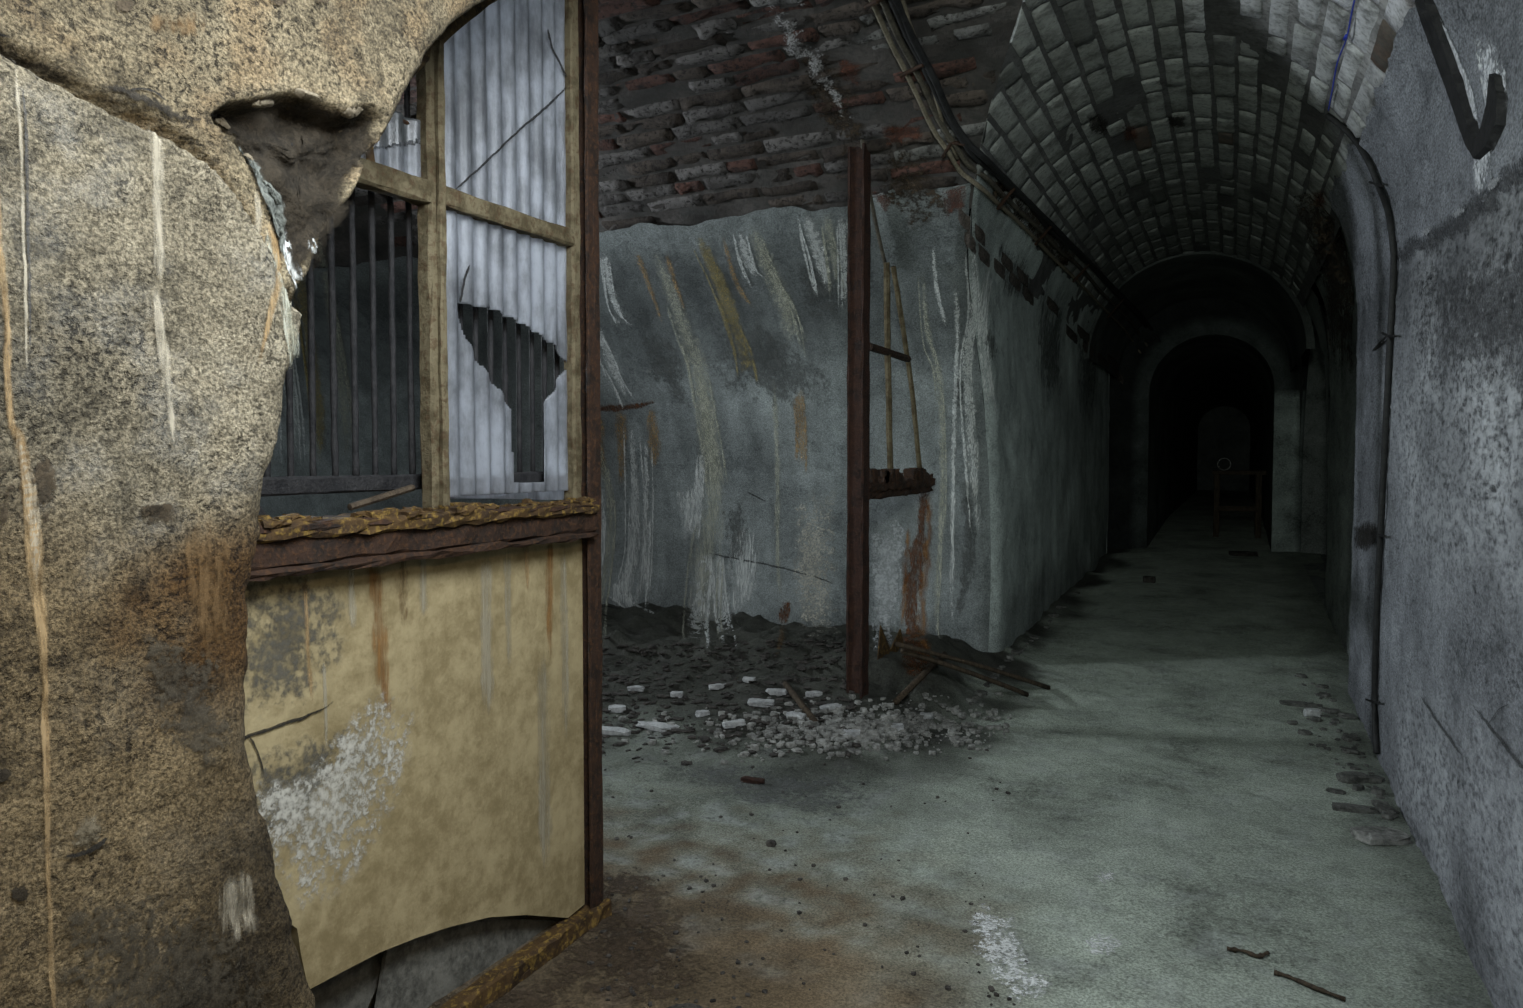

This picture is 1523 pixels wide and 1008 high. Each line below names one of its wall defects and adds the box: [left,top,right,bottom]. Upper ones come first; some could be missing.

crack [0,33,69,84]
crack [106,85,199,121]
leakage [755,0,843,117]
spalling [211,88,376,274]
leakage [600,257,632,406]
leakage [797,218,848,319]
leakage [245,570,355,701]
leakage [601,431,654,613]
leakage [690,506,756,642]
rust [902,493,931,676]
crack [245,705,329,772]
leakage [252,704,410,897]